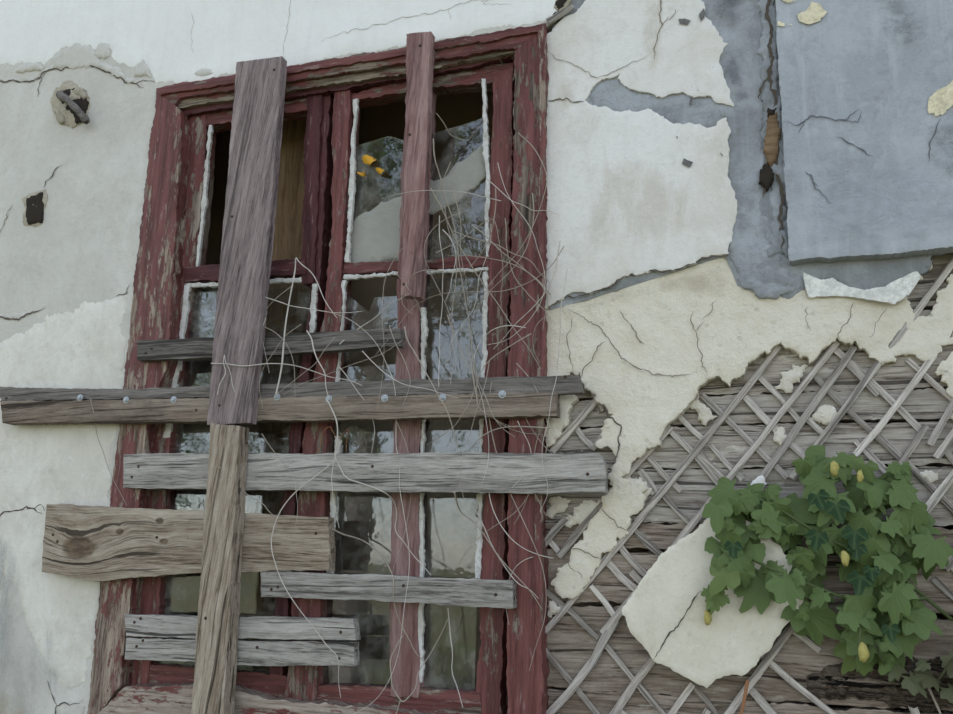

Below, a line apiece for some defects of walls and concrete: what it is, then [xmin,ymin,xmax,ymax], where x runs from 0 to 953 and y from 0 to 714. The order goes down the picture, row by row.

spalling [553,0,585,24]
crack [0,65,156,94]
peeling [16,42,151,129]
peeling [588,0,921,304]
spalling [22,189,48,227]
crack [0,305,46,320]
crack [547,254,729,378]
crack [596,401,622,463]
crack [0,504,45,516]
crack [47,681,84,714]